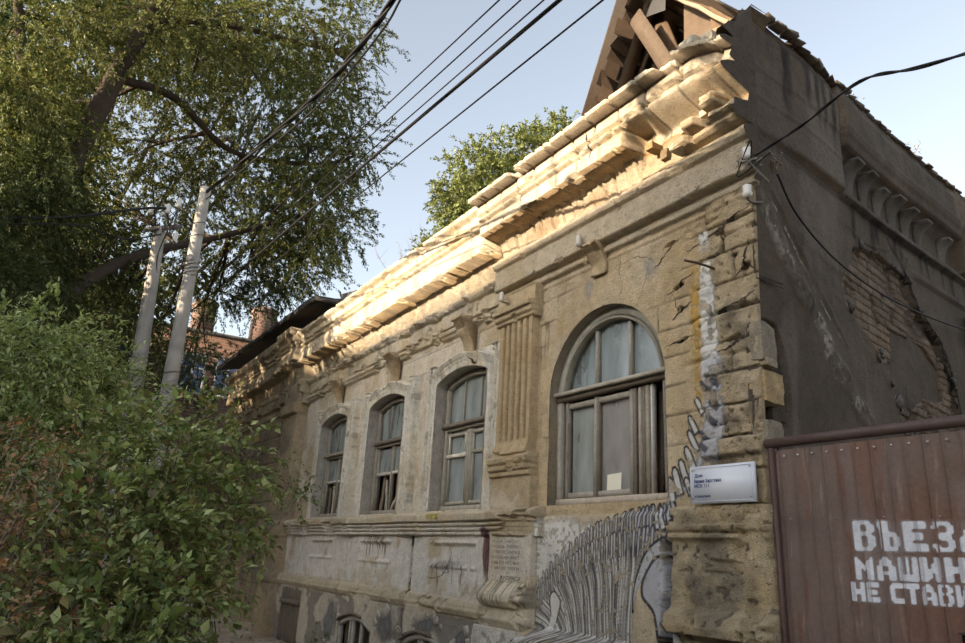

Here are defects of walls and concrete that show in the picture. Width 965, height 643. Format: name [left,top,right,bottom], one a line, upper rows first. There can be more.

crack [618,205,784,346]
crack [710,331,750,355]
flaking render [842,239,959,436]